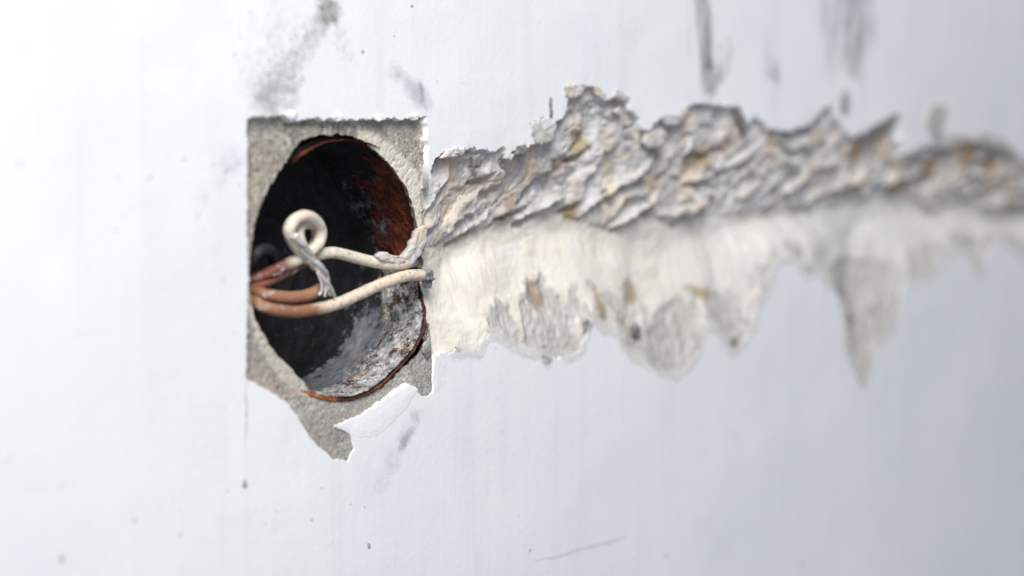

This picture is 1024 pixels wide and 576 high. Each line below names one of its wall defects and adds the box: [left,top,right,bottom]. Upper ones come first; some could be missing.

rust [287,139,418,256]
flaking render [245,84,1024,461]
rust [300,297,426,402]